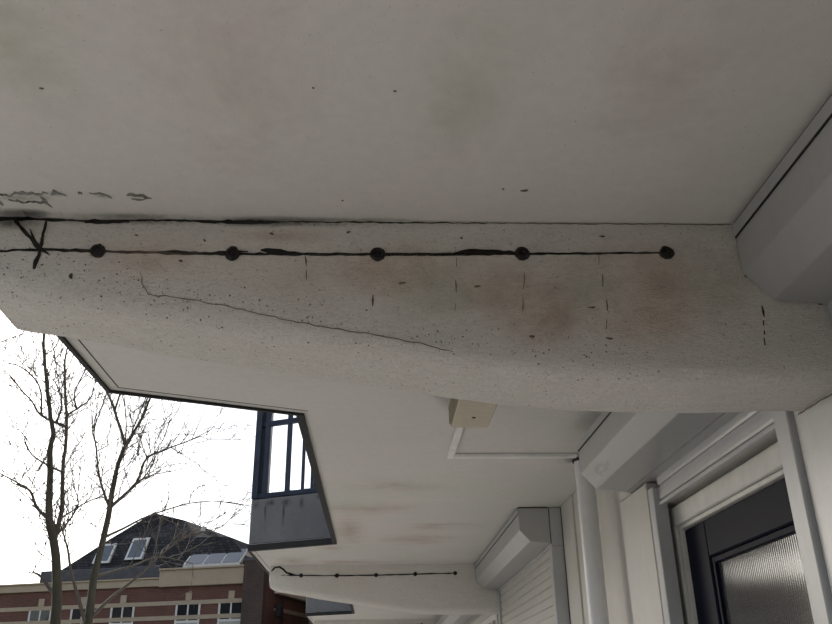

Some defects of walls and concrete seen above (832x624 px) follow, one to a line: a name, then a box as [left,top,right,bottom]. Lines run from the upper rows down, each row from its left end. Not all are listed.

peeling [0,189,67,208]
crack [0,217,731,352]
crack [271,566,453,576]